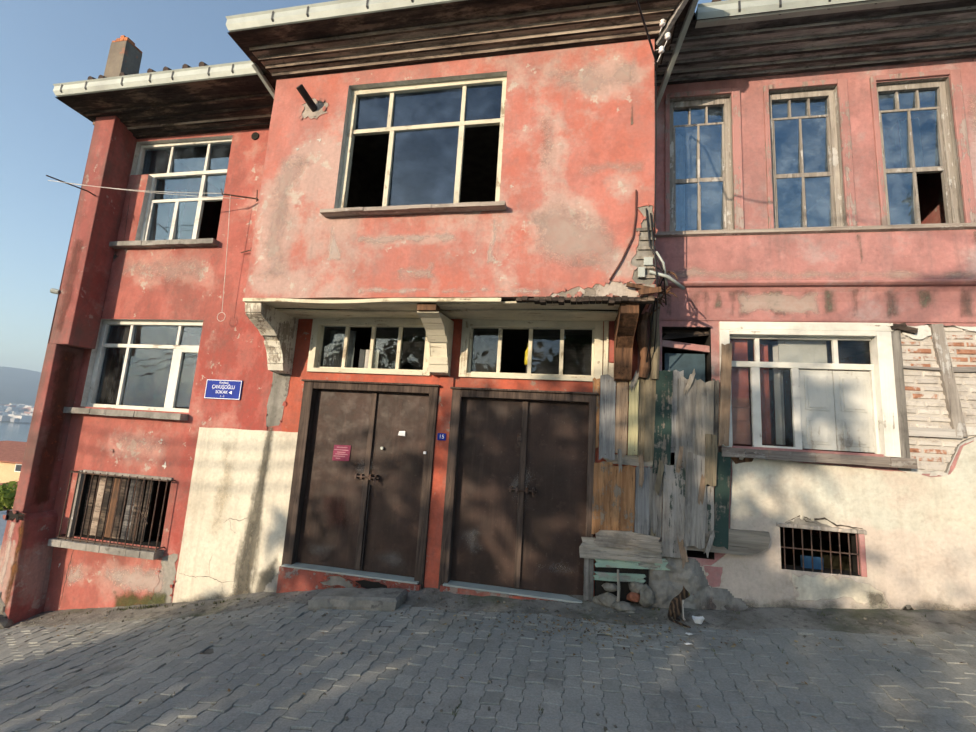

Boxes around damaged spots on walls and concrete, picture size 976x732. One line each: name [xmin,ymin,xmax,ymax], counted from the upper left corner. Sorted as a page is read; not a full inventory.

spalling [299,98,329,120]
spalling [548,203,659,300]
peeling [902,325,932,340]
peeling [263,368,293,430]
leakage [183,428,275,602]